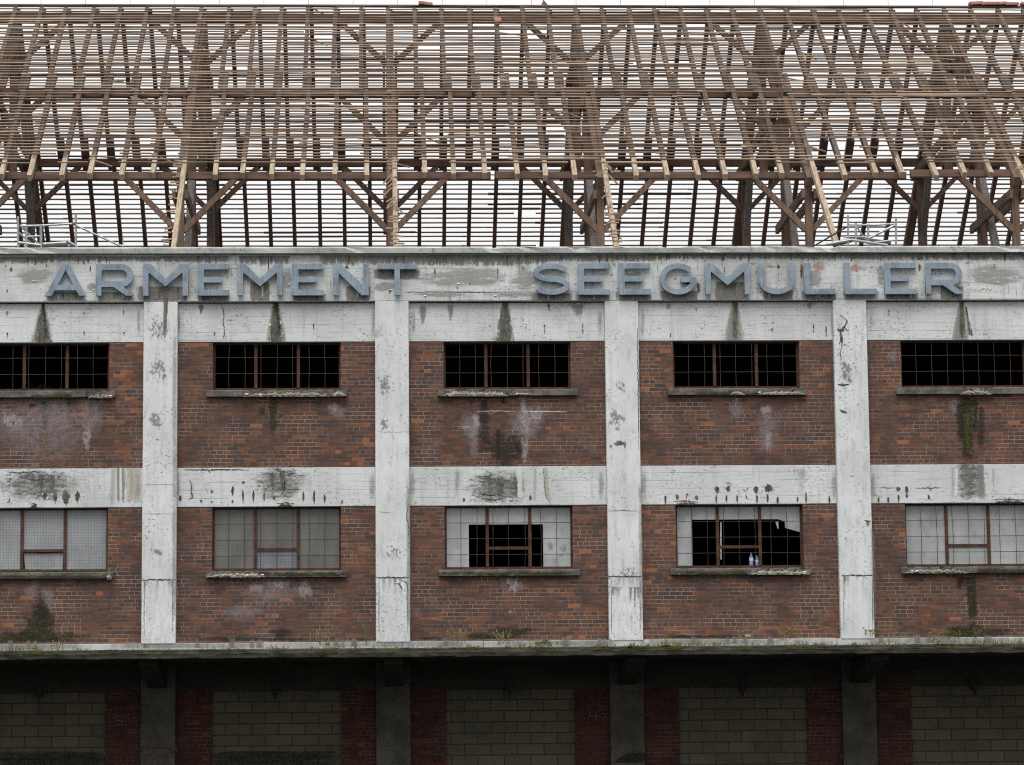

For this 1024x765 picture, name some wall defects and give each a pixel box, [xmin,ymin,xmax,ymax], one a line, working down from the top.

water stain [32,292,82,342]
water stain [250,282,285,342]
water stain [495,303,514,341]
water stain [941,286,973,339]
crack [837,315,849,413]
water stain [6,433,66,499]
water stain [257,463,302,501]
water stain [470,430,524,502]
water stain [954,399,985,499]
water stain [0,597,72,648]